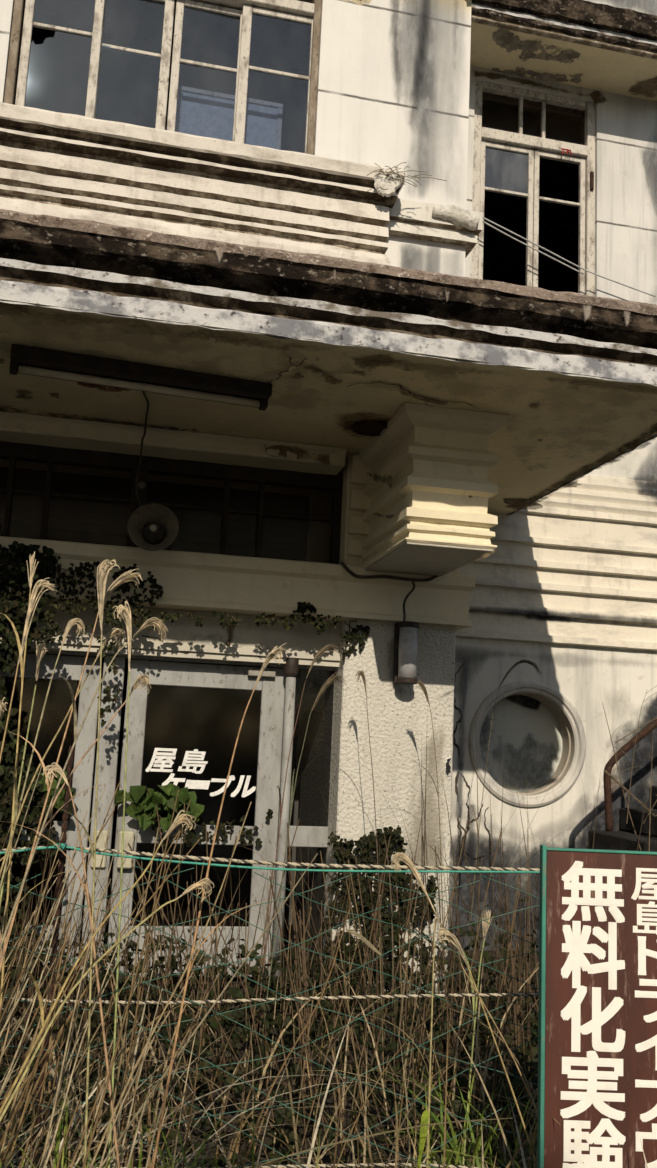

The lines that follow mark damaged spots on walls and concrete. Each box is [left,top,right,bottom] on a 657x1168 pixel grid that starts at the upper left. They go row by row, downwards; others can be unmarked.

peeling [474,28,607,104]
damp [395,0,437,186]
damp [402,245,420,270]
crack [347,382,475,408]
damp [636,457,657,498]
damp [469,608,657,624]
damp [505,695,541,709]
damp [413,698,657,951]